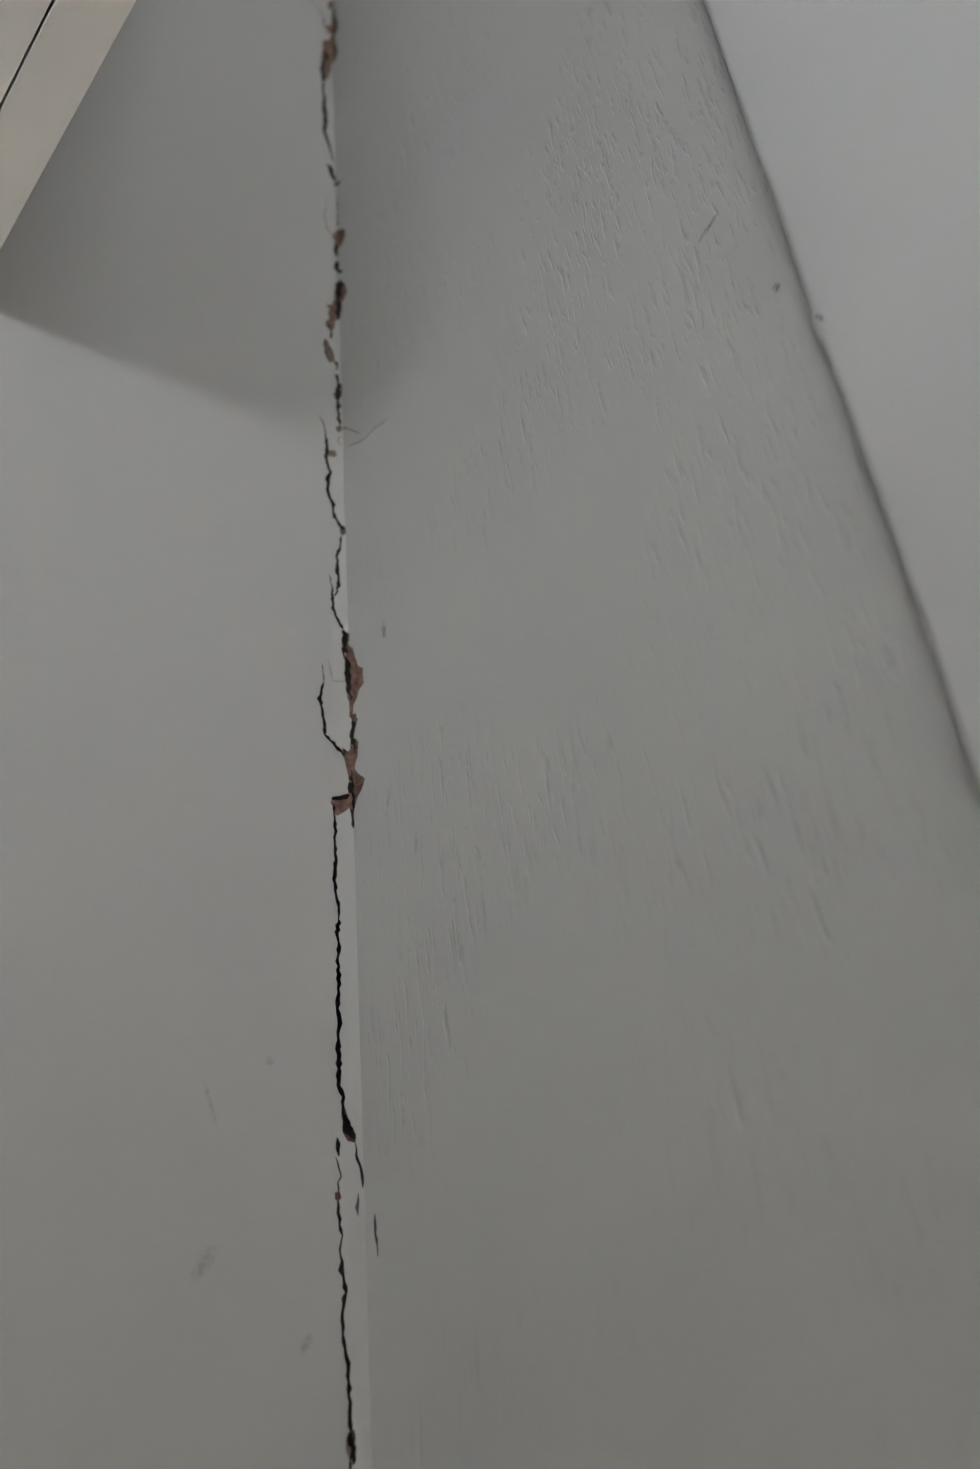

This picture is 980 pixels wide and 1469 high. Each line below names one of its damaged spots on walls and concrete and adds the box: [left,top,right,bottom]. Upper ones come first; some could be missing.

crack [322,82,341,187]
crack [319,415,385,629]
spalling [317,629,365,828]
crack [332,814,378,1469]